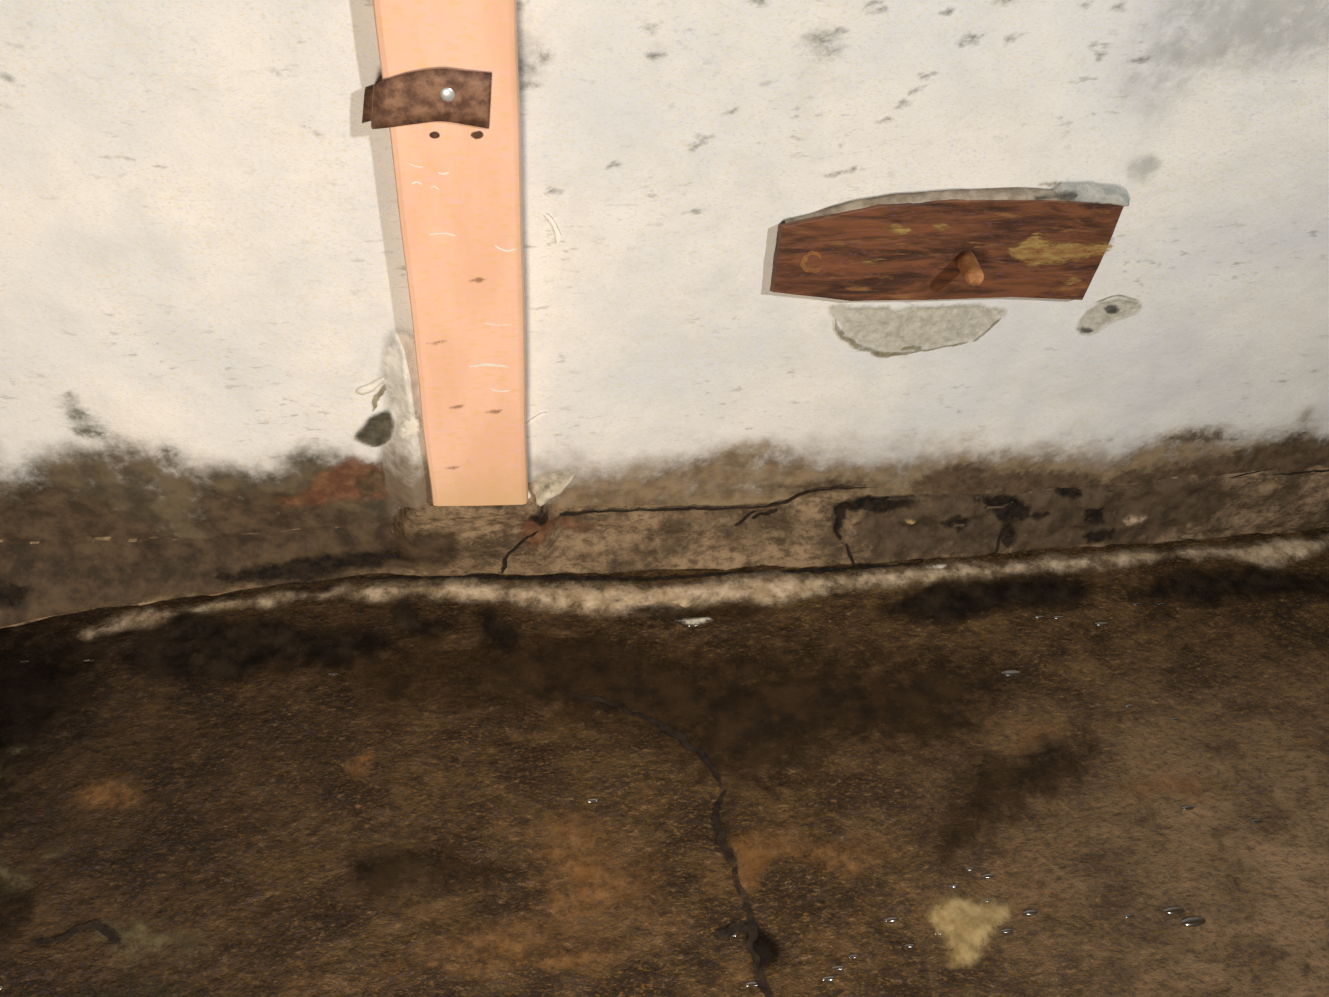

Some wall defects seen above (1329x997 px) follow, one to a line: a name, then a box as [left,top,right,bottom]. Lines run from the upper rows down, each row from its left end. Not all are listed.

flaking render [831,305,1004,358]
flaking render [1080,295,1141,334]
flaking render [355,385,393,447]
leakage [552,432,1329,560]
crack [360,486,924,581]
leakage [0,411,996,788]
leakage [883,577,1092,624]
leakage [1128,568,1329,607]
crack [565,693,778,997]